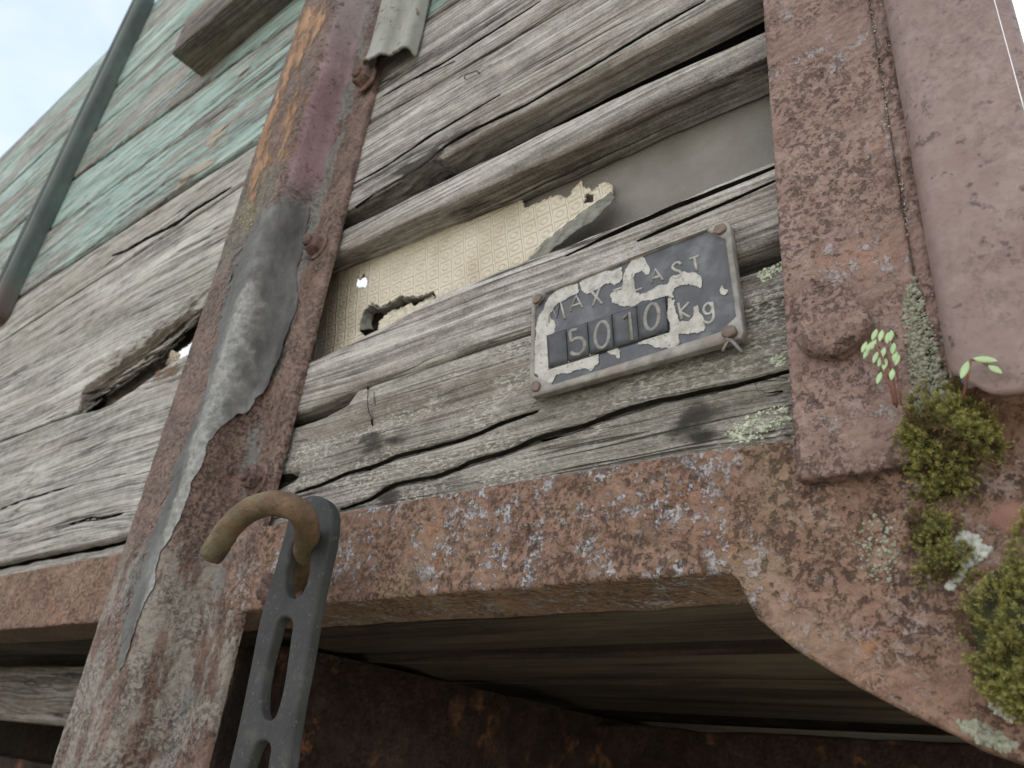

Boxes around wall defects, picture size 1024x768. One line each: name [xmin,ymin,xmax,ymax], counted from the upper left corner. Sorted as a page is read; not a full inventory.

peeling [166,124,227,190]
corrosion [244,0,327,204]
crack [354,0,706,208]
peeling [526,189,615,261]
peeling [118,194,309,671]
crack [278,370,789,510]
corrosion [989,501,1024,535]